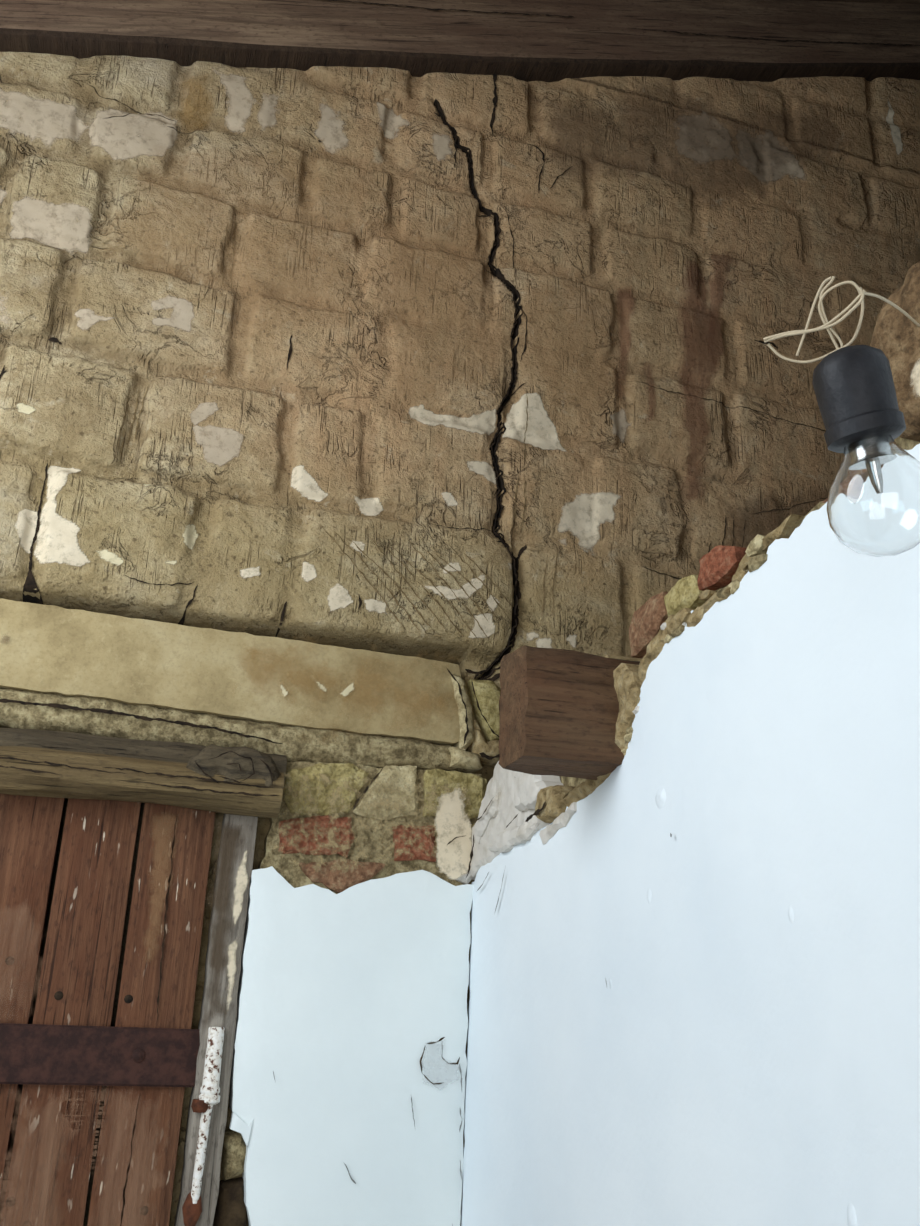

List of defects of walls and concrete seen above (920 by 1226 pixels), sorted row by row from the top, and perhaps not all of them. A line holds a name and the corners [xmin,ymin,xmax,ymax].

crack [526,143,572,193]
peeling [0,189,91,252]
crack [429,74,527,681]
peeling [409,393,566,451]
crack [29,462,48,569]
peeling [15,466,123,605]
peeling [558,492,620,551]
peeling [327,584,386,613]
peeling [425,563,499,638]
spalling [629,545,747,659]
flaking render [233,669,577,924]
peeling [227,941,237,1005]